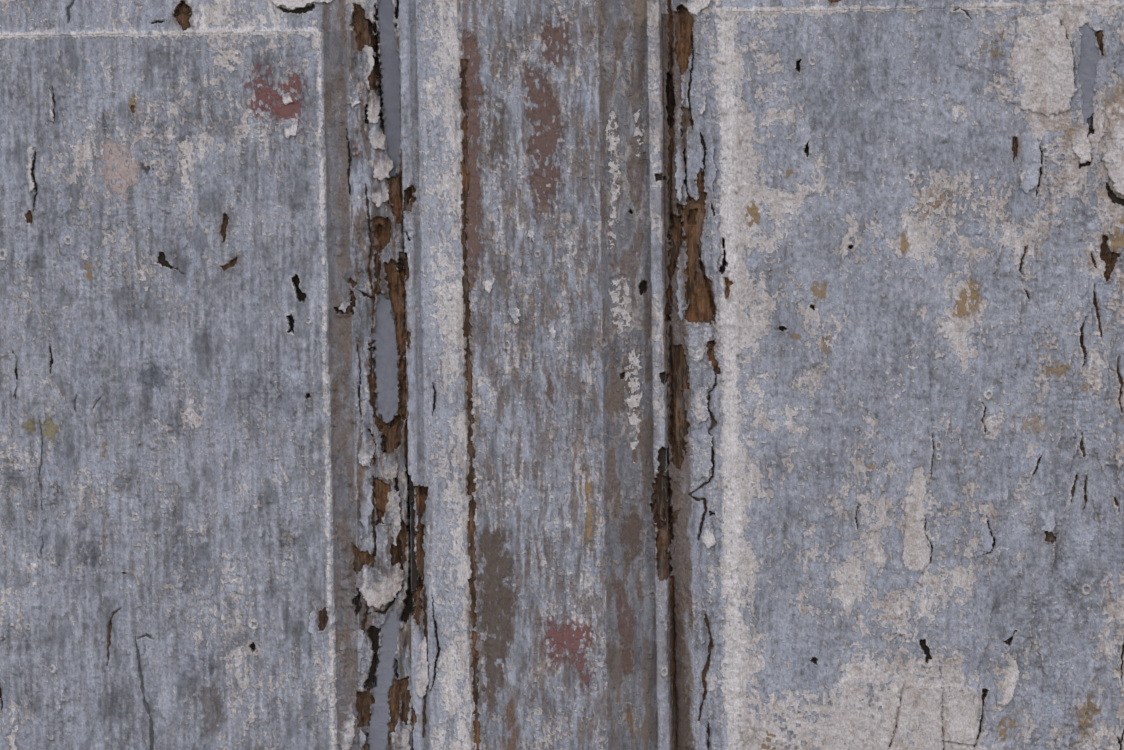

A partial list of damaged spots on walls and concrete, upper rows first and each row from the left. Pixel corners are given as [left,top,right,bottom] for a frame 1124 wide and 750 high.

peeling [991,12,1124,206]
peeling [605,110,645,249]
peeling [318,0,429,750]
peeling [609,276,647,334]
peeling [619,346,642,464]
peeling [650,0,733,750]
crack [682,372,717,540]
peeling [1093,292,1102,337]
peeling [1091,235,1120,282]
spalling [1041,511,1056,544]
crack [694,615,714,750]